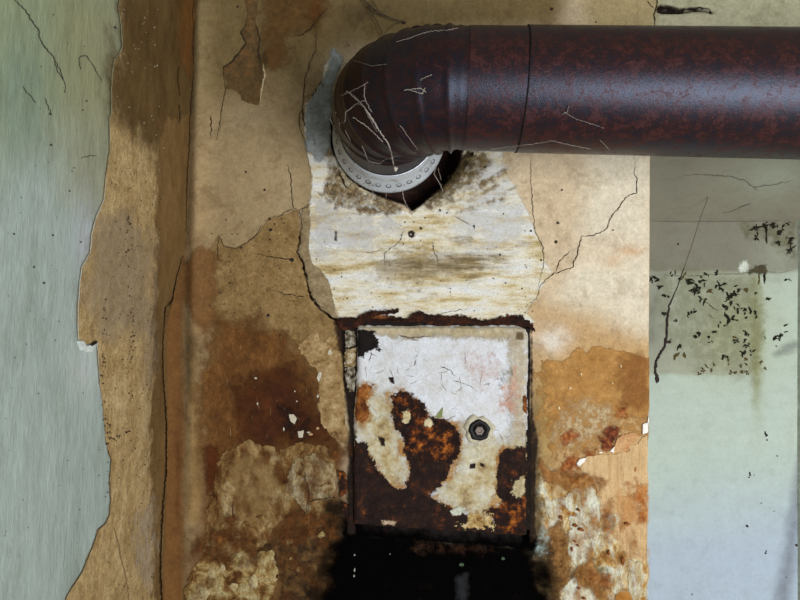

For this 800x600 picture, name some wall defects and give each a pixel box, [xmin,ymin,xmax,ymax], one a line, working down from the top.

peeling [220,0,266,128]
peeling [65,0,196,600]
crack [159,3,220,600]
leakage [174,210,339,371]
flaking render [183,331,348,600]
crack [253,172,337,321]
corrosion [191,308,538,600]
peeling [298,49,552,324]
crack [530,160,638,301]
leakage [533,346,649,462]
mould [670,265,767,343]
mould [697,330,756,375]